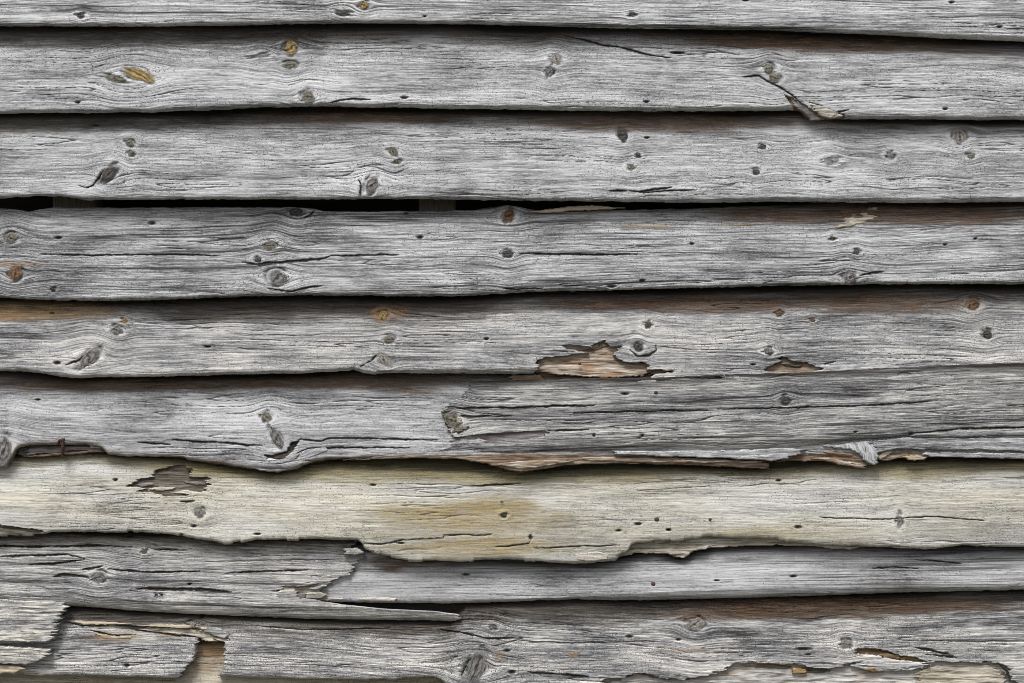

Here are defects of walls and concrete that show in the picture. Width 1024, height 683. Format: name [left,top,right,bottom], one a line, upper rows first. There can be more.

crack [746,75,803,107]
crack [292,438,417,453]
peeling [496,457,762,469]
peeling [812,457,867,468]
peeling [127,461,212,497]
peeling [71,621,231,642]
peeling [608,652,1016,683]